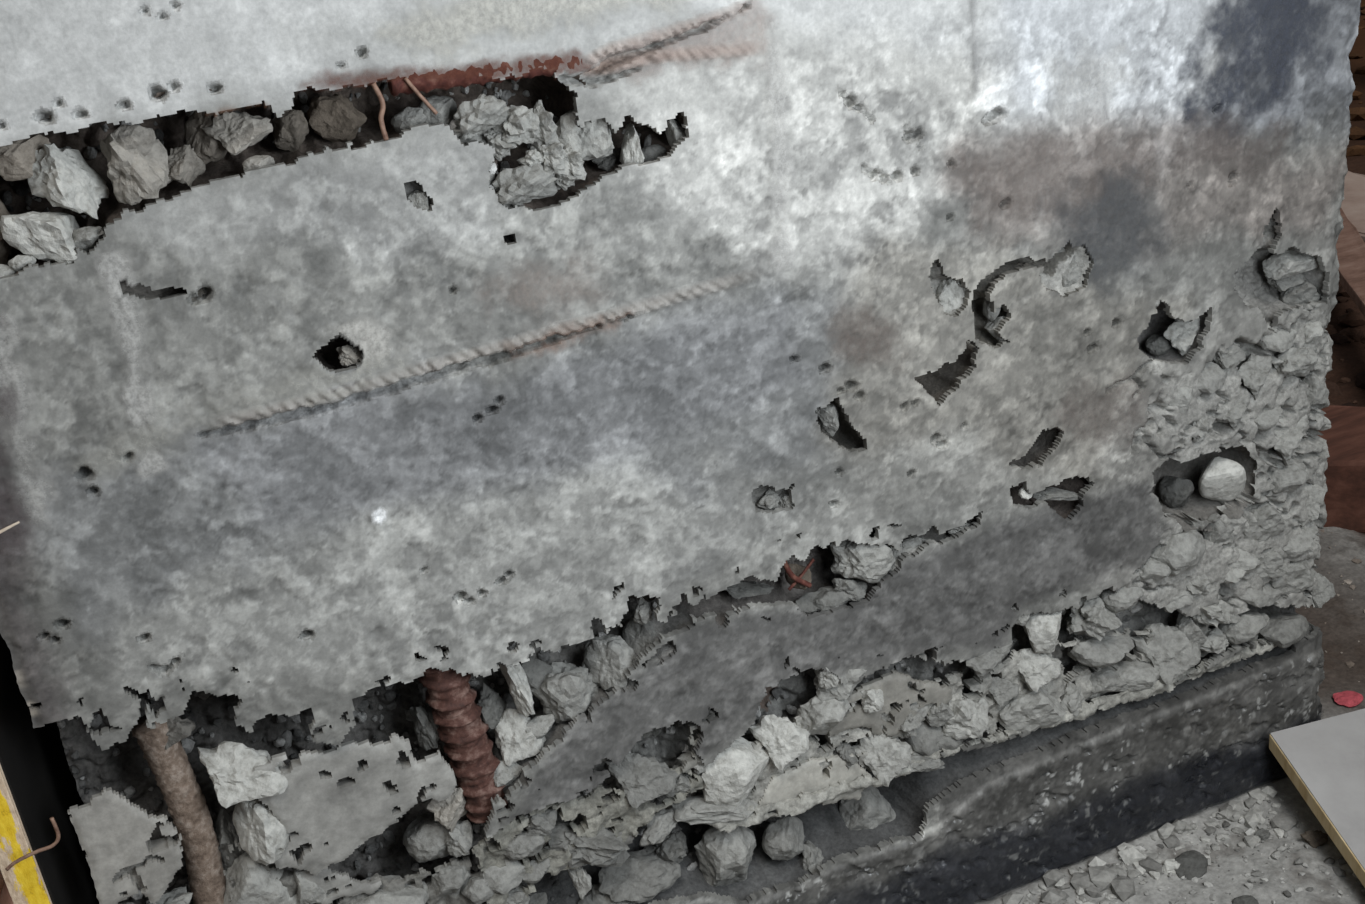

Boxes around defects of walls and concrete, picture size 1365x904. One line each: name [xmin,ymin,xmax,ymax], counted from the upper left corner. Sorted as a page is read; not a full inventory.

spalling [137,0,185,21]
spalling [335,44,371,70]
rust [328,54,585,86]
damp [1182,0,1331,152]
spalling [0,55,686,277]
hole [1137,300,1208,362]
spalling [1233,210,1325,331]
hole [1152,435,1260,532]
hole [452,568,517,607]
peeling [68,712,241,904]
peeling [253,647,708,904]
peeling [708,613,1277,833]